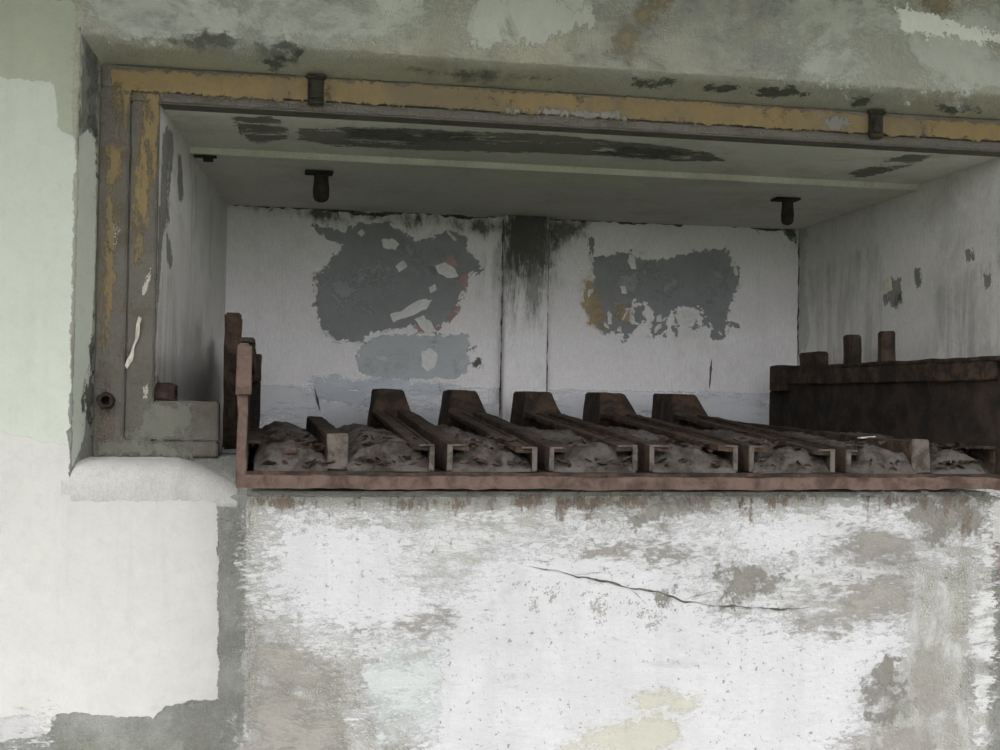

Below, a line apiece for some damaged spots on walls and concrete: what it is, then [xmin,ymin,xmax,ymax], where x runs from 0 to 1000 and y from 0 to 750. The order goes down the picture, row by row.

peeling [142,126,184,337]
damp [310,210,337,221]
damp [456,215,587,314]
peeling [311,219,486,381]
peeling [581,237,740,344]
corrosion [257,495,317,511]
corrosion [515,494,543,510]
corrosion [555,494,648,521]
crack [531,566,808,616]